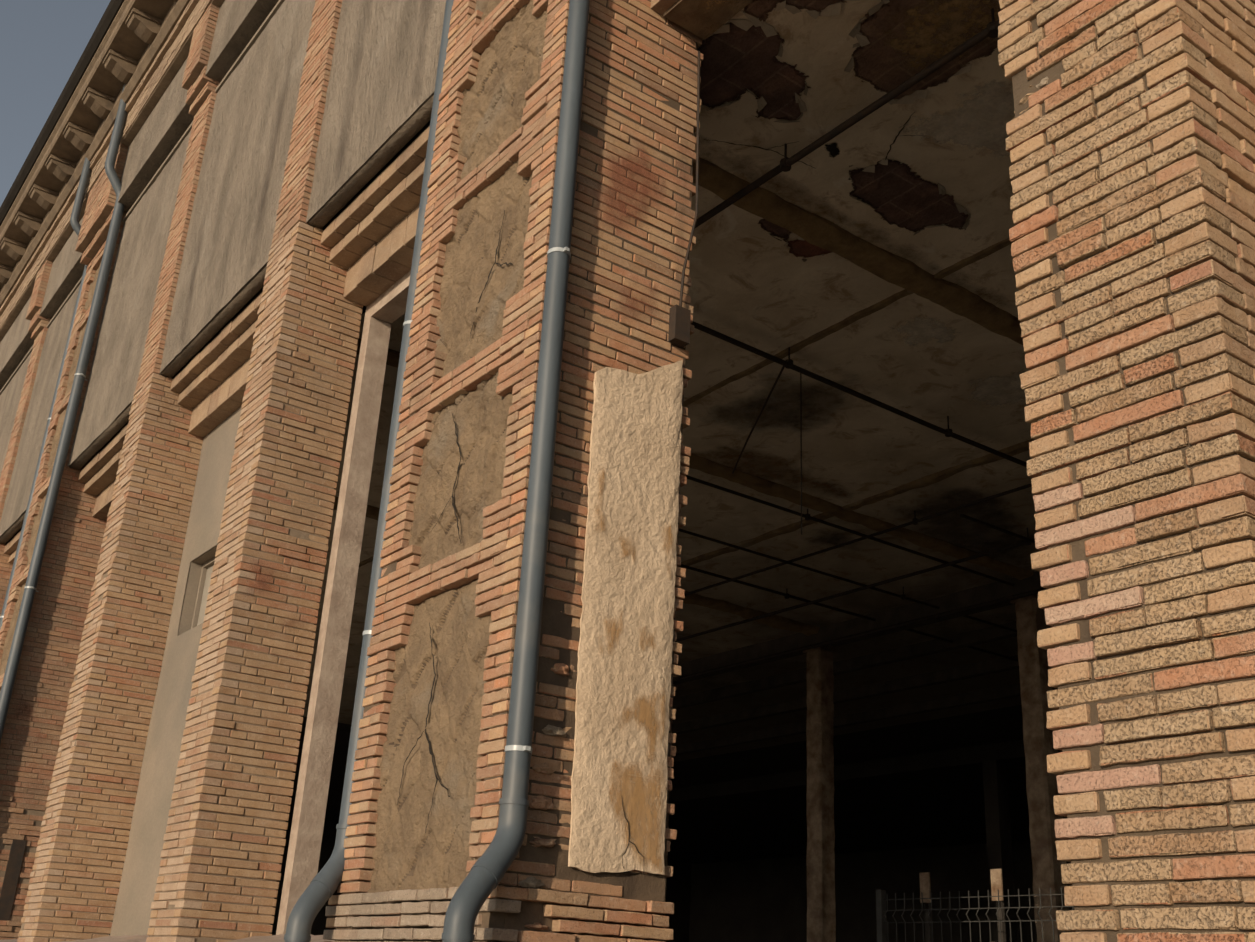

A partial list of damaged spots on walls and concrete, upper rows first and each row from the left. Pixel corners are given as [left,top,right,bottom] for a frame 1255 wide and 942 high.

flaking render [697,0,1001,123]
flaking render [758,219,831,262]
flaking render [848,159,971,235]
damp [610,692,664,867]